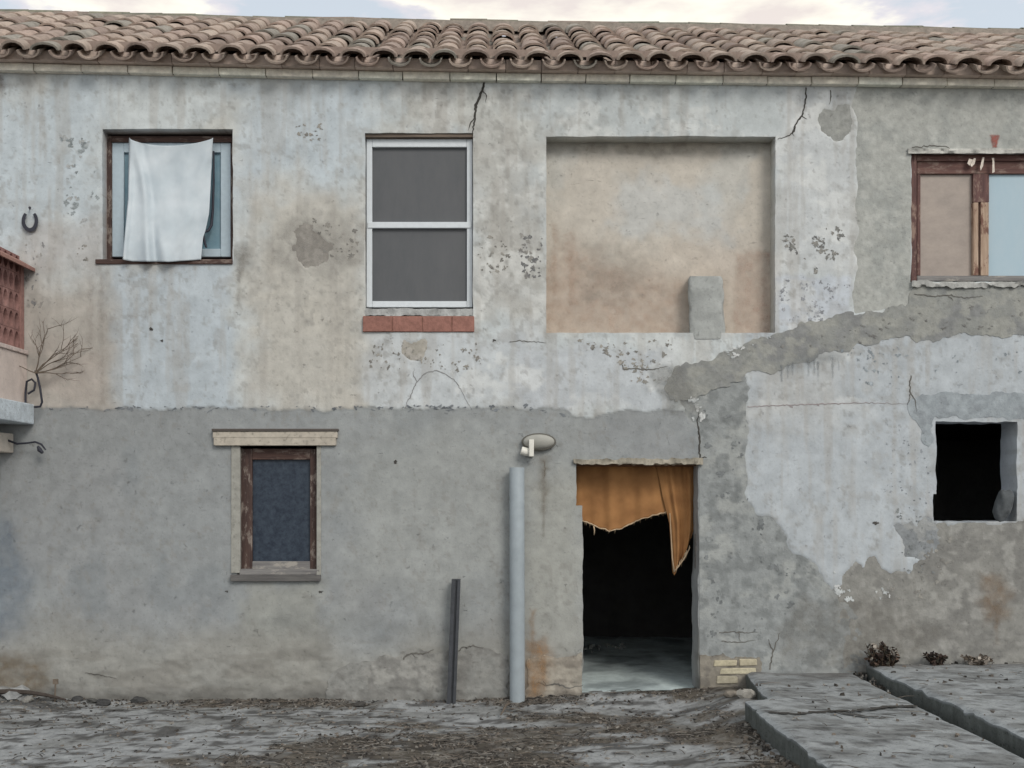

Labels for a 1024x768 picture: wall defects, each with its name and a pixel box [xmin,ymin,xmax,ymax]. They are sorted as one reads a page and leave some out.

crack [468,82,487,133]
crack [778,87,832,139]
peeling [292,218,359,268]
peeling [478,233,543,279]
flaking render [780,87,1024,386]
peeling [578,339,672,384]
crack [405,370,471,408]
crack [697,413,707,458]
spalling [680,376,1024,689]